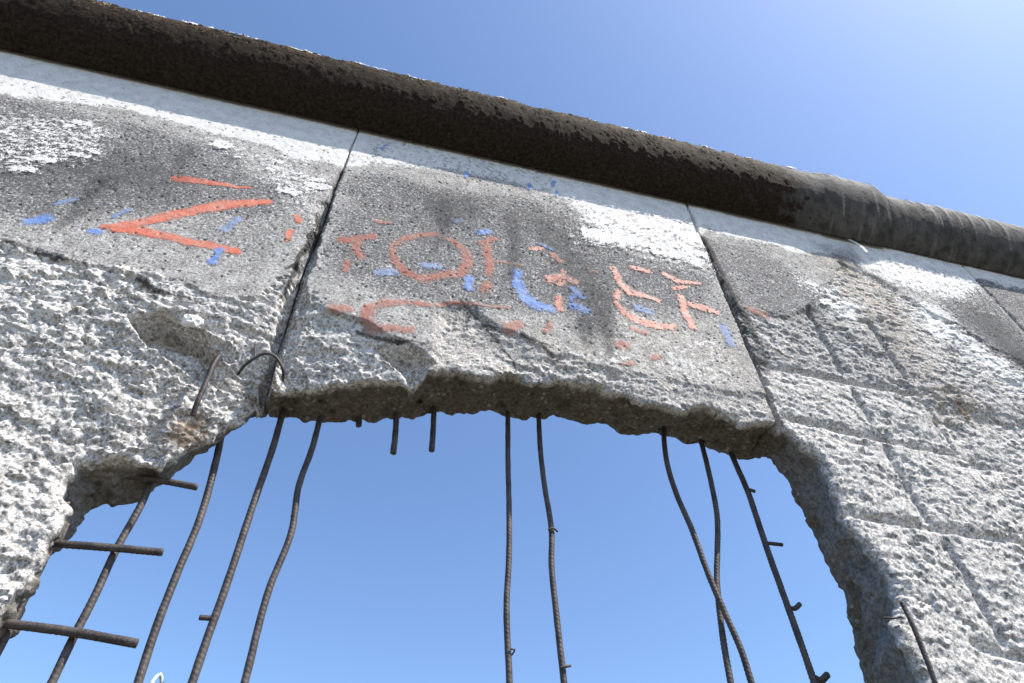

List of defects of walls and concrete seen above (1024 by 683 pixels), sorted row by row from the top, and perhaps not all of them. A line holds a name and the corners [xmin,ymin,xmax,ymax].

corrosion [190,354,221,417]
spalling [0,241,1024,683]